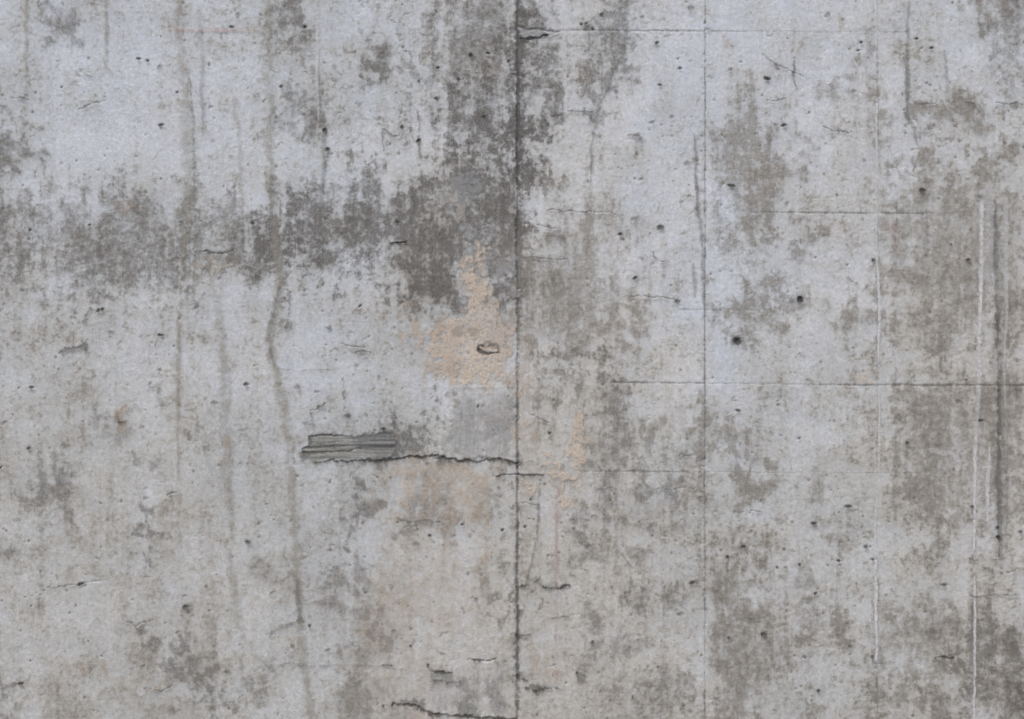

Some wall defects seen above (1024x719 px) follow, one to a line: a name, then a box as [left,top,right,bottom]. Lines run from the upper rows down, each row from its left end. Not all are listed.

water stain [255,75,575,314]
peeling [415,226,516,393]
spalling [300,428,395,462]
crack [315,452,543,477]